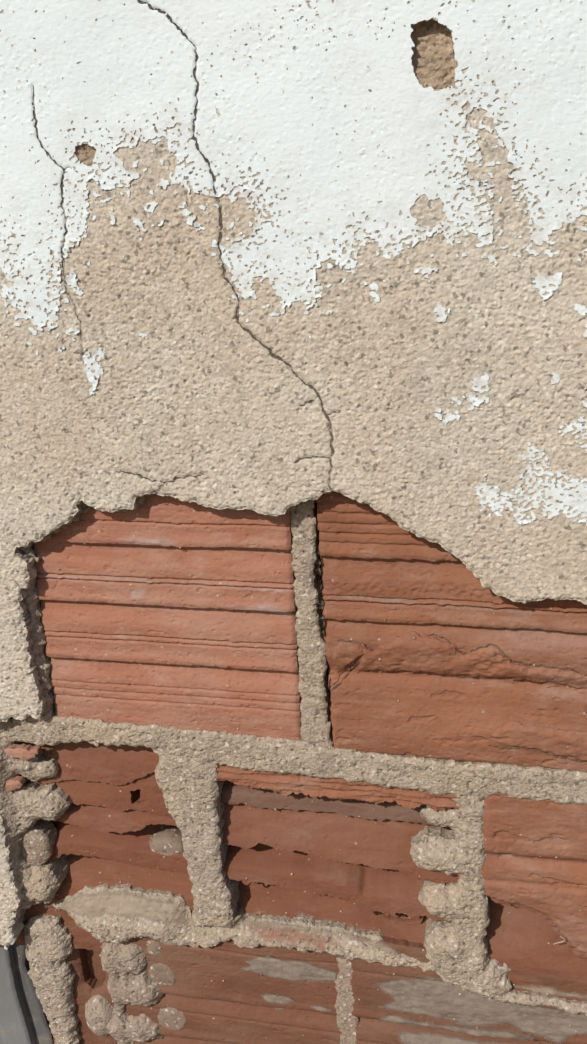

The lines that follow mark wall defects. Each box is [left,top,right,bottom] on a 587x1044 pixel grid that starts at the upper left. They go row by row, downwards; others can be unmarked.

crack [32,87,84,364]
crack [137,0,340,494]
peeling [0,19,587,395]
peeling [434,374,490,426]
peeling [558,388,587,451]
spalling [19,501,91,562]
spalling [114,494,150,512]
crack [117,471,203,495]
peeling [474,442,587,526]
crack [315,548,373,707]
spalling [330,631,587,710]
spalling [491,720,587,761]